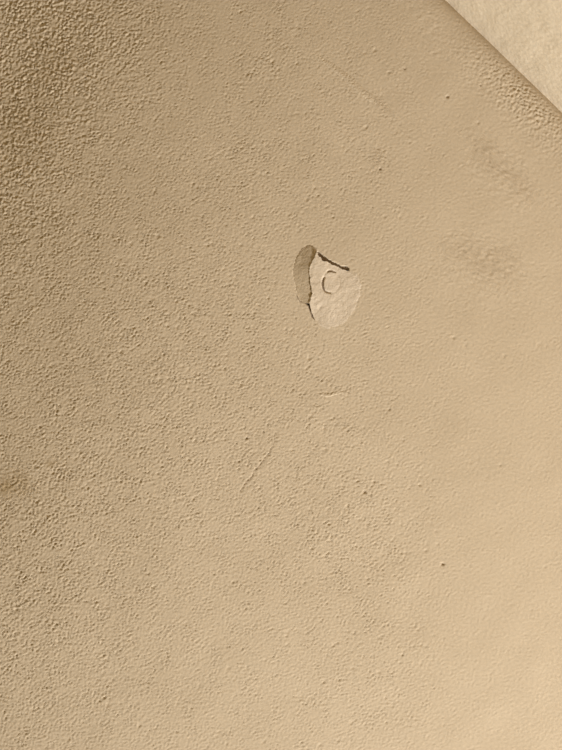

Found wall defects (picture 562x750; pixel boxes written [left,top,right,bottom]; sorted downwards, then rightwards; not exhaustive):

flaking render [293,246,362,329]